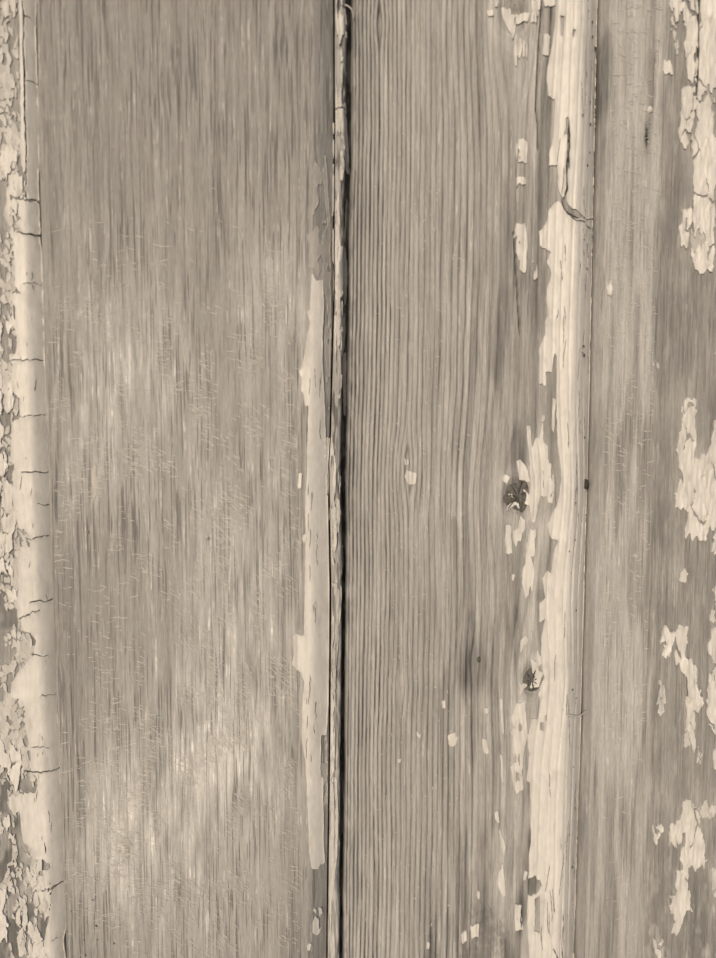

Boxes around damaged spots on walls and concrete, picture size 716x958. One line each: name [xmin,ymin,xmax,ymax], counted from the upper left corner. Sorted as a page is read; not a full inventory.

crack [561,119,590,229]
peeling [662,0,716,275]
peeling [0,0,67,958]
peeling [292,0,350,951]
peeling [482,0,598,958]
peeling [674,397,716,555]
peeling [656,679,666,716]
peeling [659,585,716,770]
peeling [651,799,716,958]